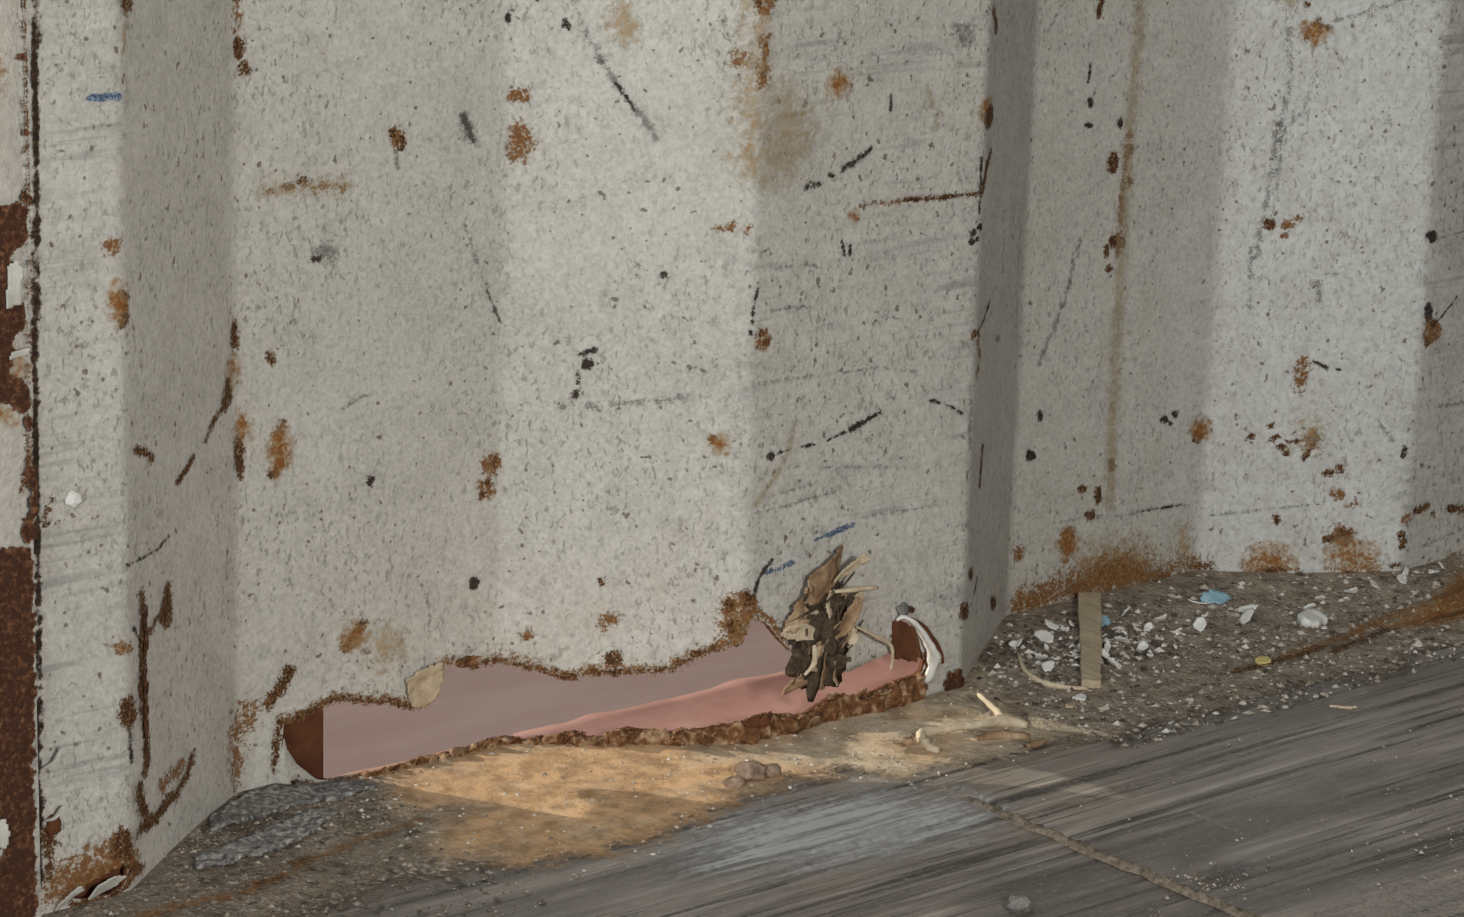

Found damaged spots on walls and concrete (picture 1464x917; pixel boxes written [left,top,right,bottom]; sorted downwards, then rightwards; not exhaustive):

corrosion [724,0,776,175]
corrosion [228,318,241,391]
corrosion [234,415,249,481]
corrosion [41,581,197,907]